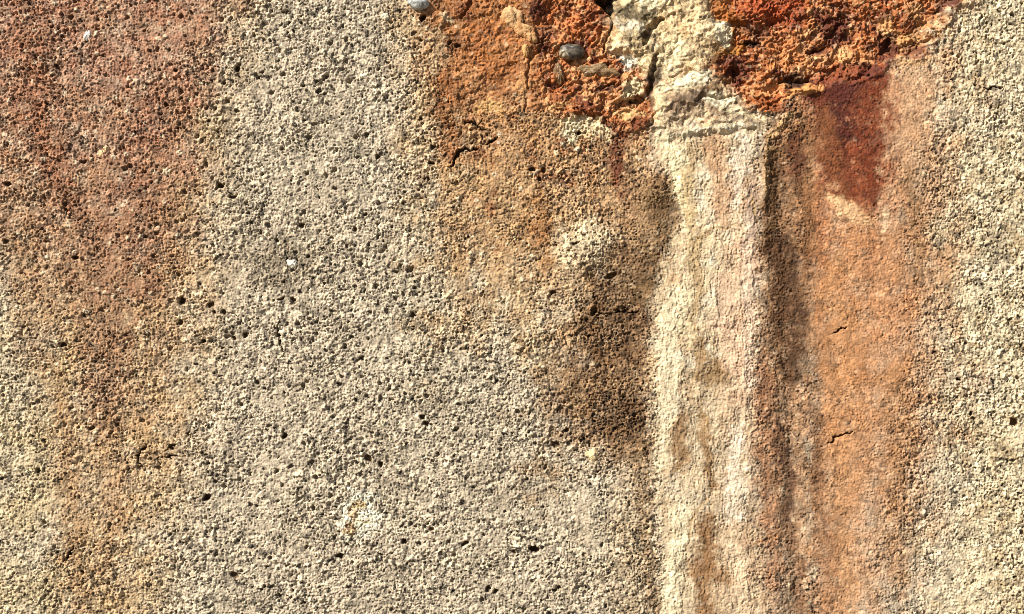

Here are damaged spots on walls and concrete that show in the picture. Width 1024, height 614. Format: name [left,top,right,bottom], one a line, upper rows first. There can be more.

rust [0,0,259,614]
spalling [420,0,649,152]
damp [524,0,852,614]
crack [827,431,854,444]
spalling [713,0,988,116]
rust [814,26,1006,614]